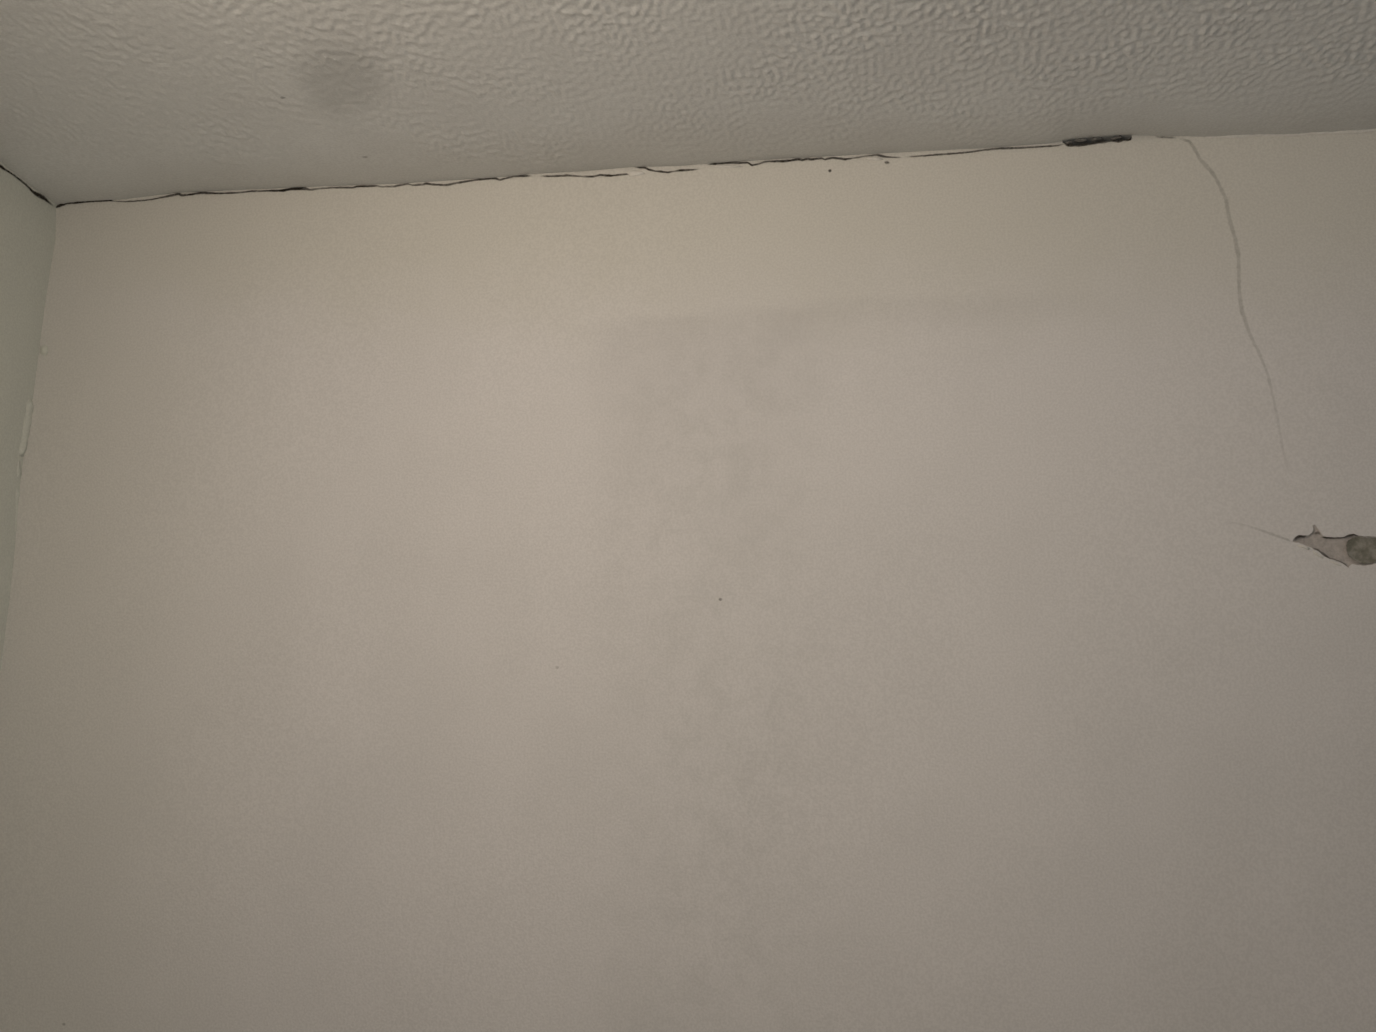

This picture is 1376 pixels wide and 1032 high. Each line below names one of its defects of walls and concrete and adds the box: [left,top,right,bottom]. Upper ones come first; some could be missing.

crack [0,145,1060,208]
peeling [1293,525,1376,568]